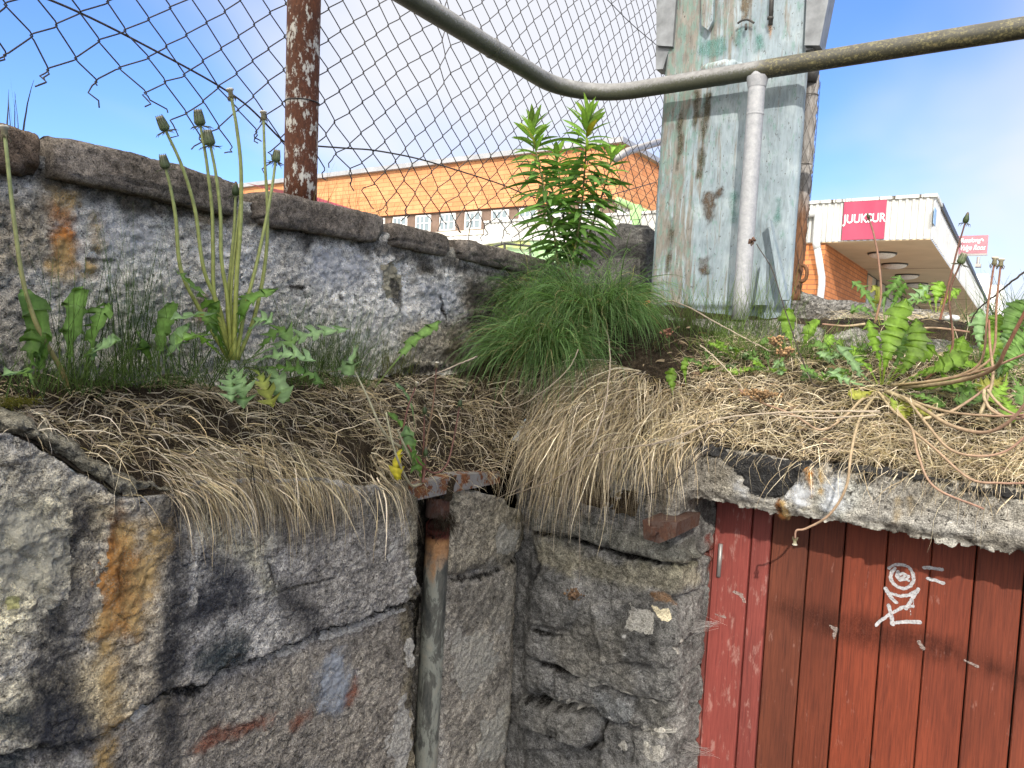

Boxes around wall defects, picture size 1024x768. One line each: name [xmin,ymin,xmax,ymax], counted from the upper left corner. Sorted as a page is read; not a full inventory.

leakage [677,90,712,178]
rust [408,470,500,500]
spalling [751,502,885,529]
spalling [922,534,994,552]
rust [90,524,160,704]